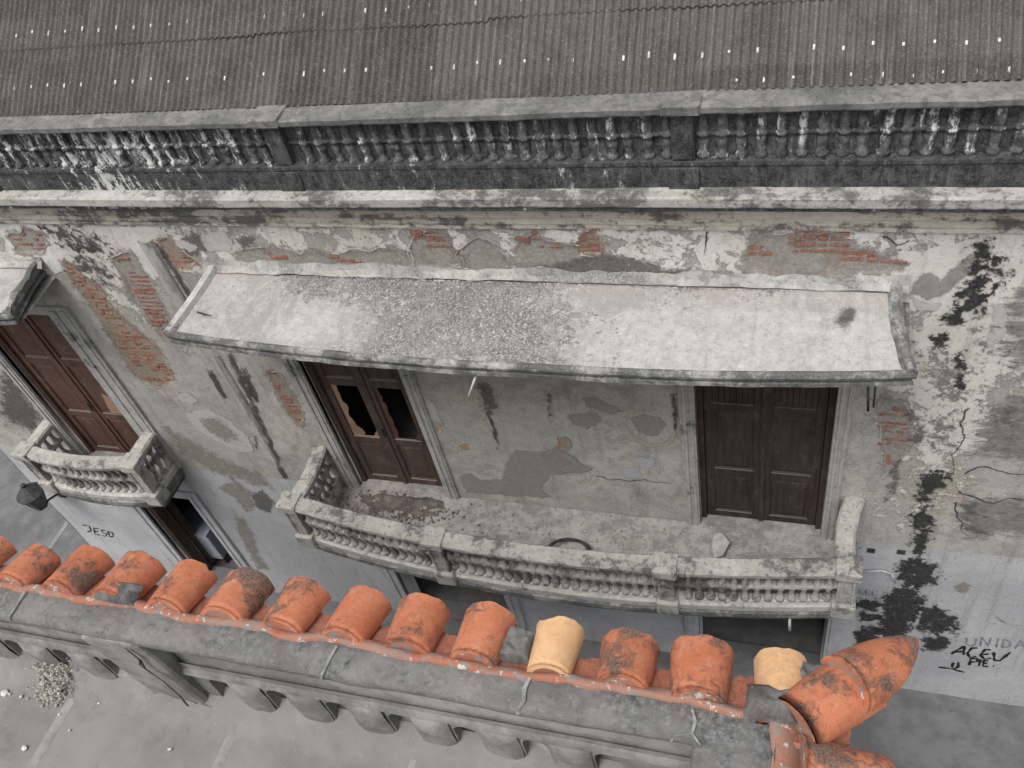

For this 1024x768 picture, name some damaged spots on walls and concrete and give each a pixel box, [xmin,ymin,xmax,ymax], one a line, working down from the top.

spalling [58,248,191,389]
leakage [208,372,226,398]
leakage [228,353,287,479]
spalling [264,370,308,428]
spalling [152,229,619,366]
leakage [474,383,499,449]
spalling [735,230,910,279]
spalling [870,393,918,480]
leakage [853,469,969,652]
leakage [906,235,1024,459]
crack [951,408,1023,536]
leakage [957,497,1024,540]